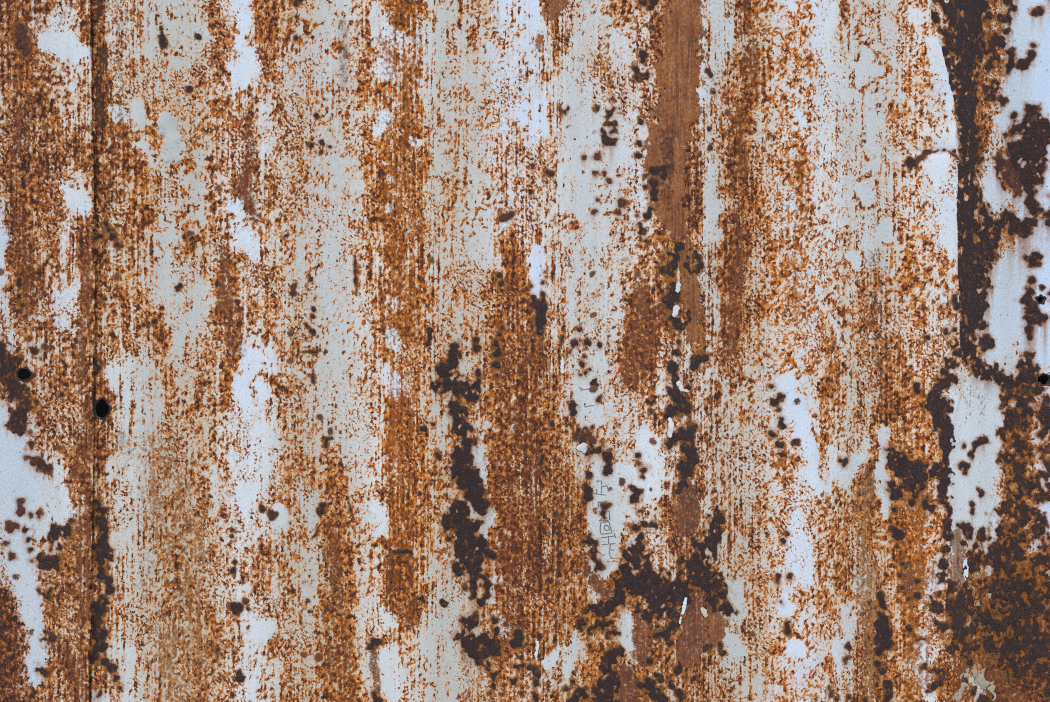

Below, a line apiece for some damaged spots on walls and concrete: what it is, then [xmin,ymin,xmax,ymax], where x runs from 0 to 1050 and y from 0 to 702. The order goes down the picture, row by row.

rust [1,0,37,77]
rust [1,105,34,167]
rust [217,246,242,366]
rust [237,117,262,221]
rust [376,0,738,702]
rust [721,38,759,362]
rust [782,158,808,327]
rust [0,173,125,702]
rust [141,432,218,702]